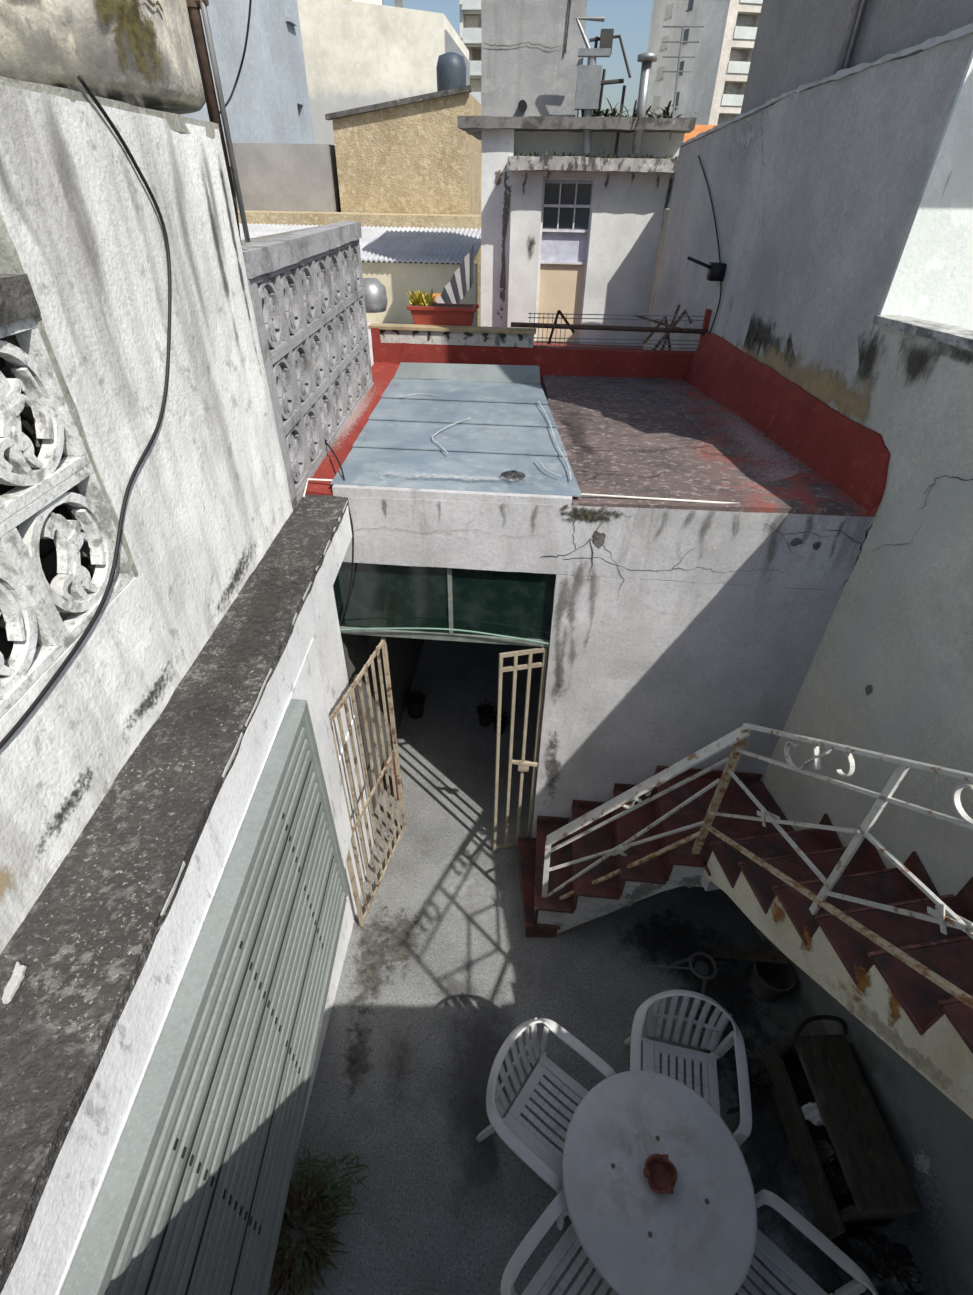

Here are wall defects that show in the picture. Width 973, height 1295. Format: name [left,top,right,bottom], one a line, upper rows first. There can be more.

crack [147,0,163,12]
leakage [0,5,170,102]
leakage [736,344,870,423]
peeling [706,400,810,486]
crack [352,412,973,596]
leakage [553,566,597,695]
leakage [545,732,561,794]
leakage [346,909,418,1099]
corrosion [853,964,870,1001]
corrosion [887,988,901,1026]